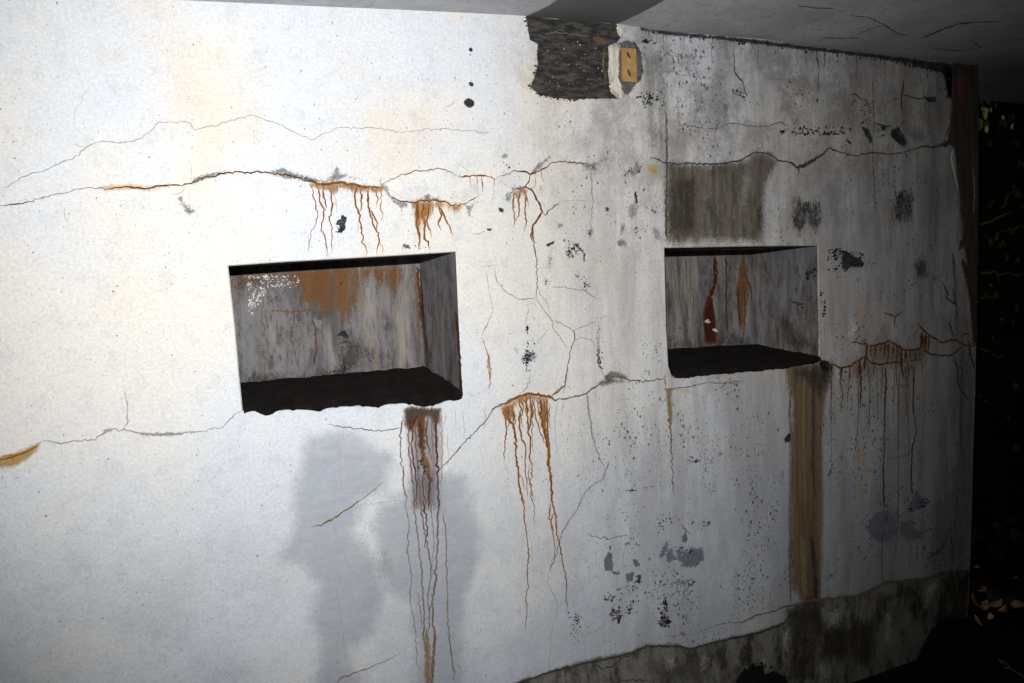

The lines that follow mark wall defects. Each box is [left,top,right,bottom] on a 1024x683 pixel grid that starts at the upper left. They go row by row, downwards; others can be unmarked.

rust [0,442,41,468]
rust [231,182,431,367]
rust [399,407,468,683]
rust [411,199,461,249]
crack [0,99,956,683]
rust [501,372,568,629]
damp [617,191,641,252]
damp [624,138,775,348]
rust [703,256,752,344]
damp [517,529,970,683]
rust [784,332,938,606]